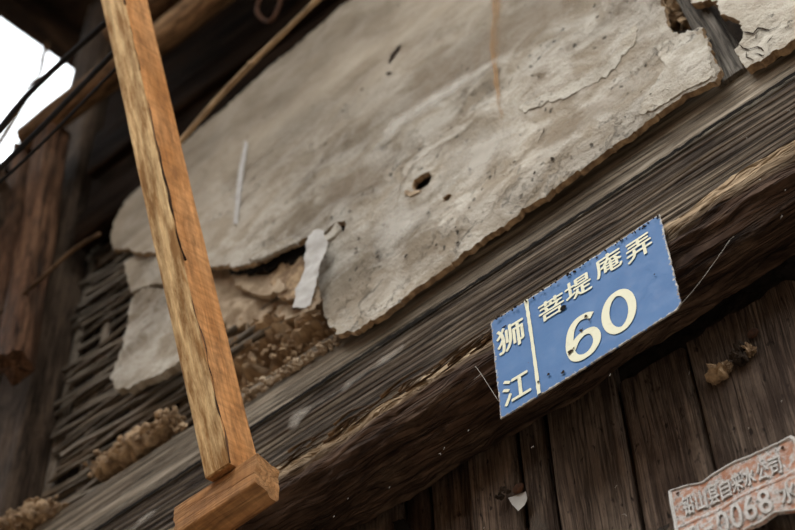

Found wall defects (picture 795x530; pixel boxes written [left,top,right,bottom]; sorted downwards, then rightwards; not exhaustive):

flaking render [211,238,335,394]